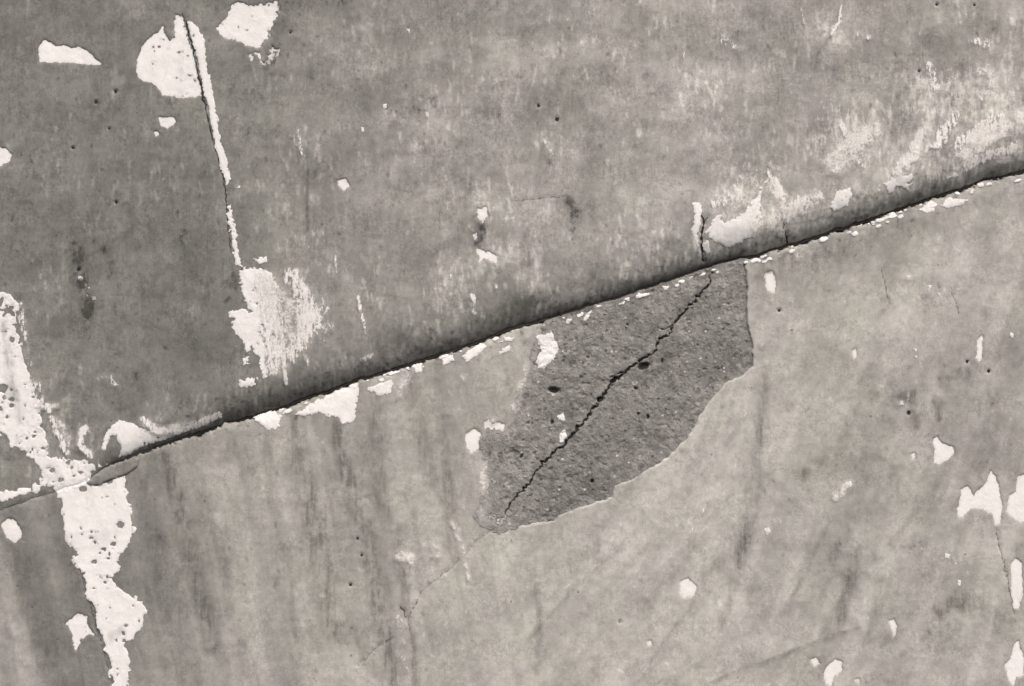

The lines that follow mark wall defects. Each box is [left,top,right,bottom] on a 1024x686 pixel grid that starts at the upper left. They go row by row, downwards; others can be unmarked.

peeling [38,40,101,65]
peeling [136,15,240,188]
crack [182,14,231,248]
peeling [216,1,280,66]
damp [711,176,753,209]
damp [761,170,822,234]
peeling [226,205,279,388]
crack [505,215,711,515]
spalling [465,178,769,534]
flaking render [0,292,147,686]
peeling [957,471,1024,525]